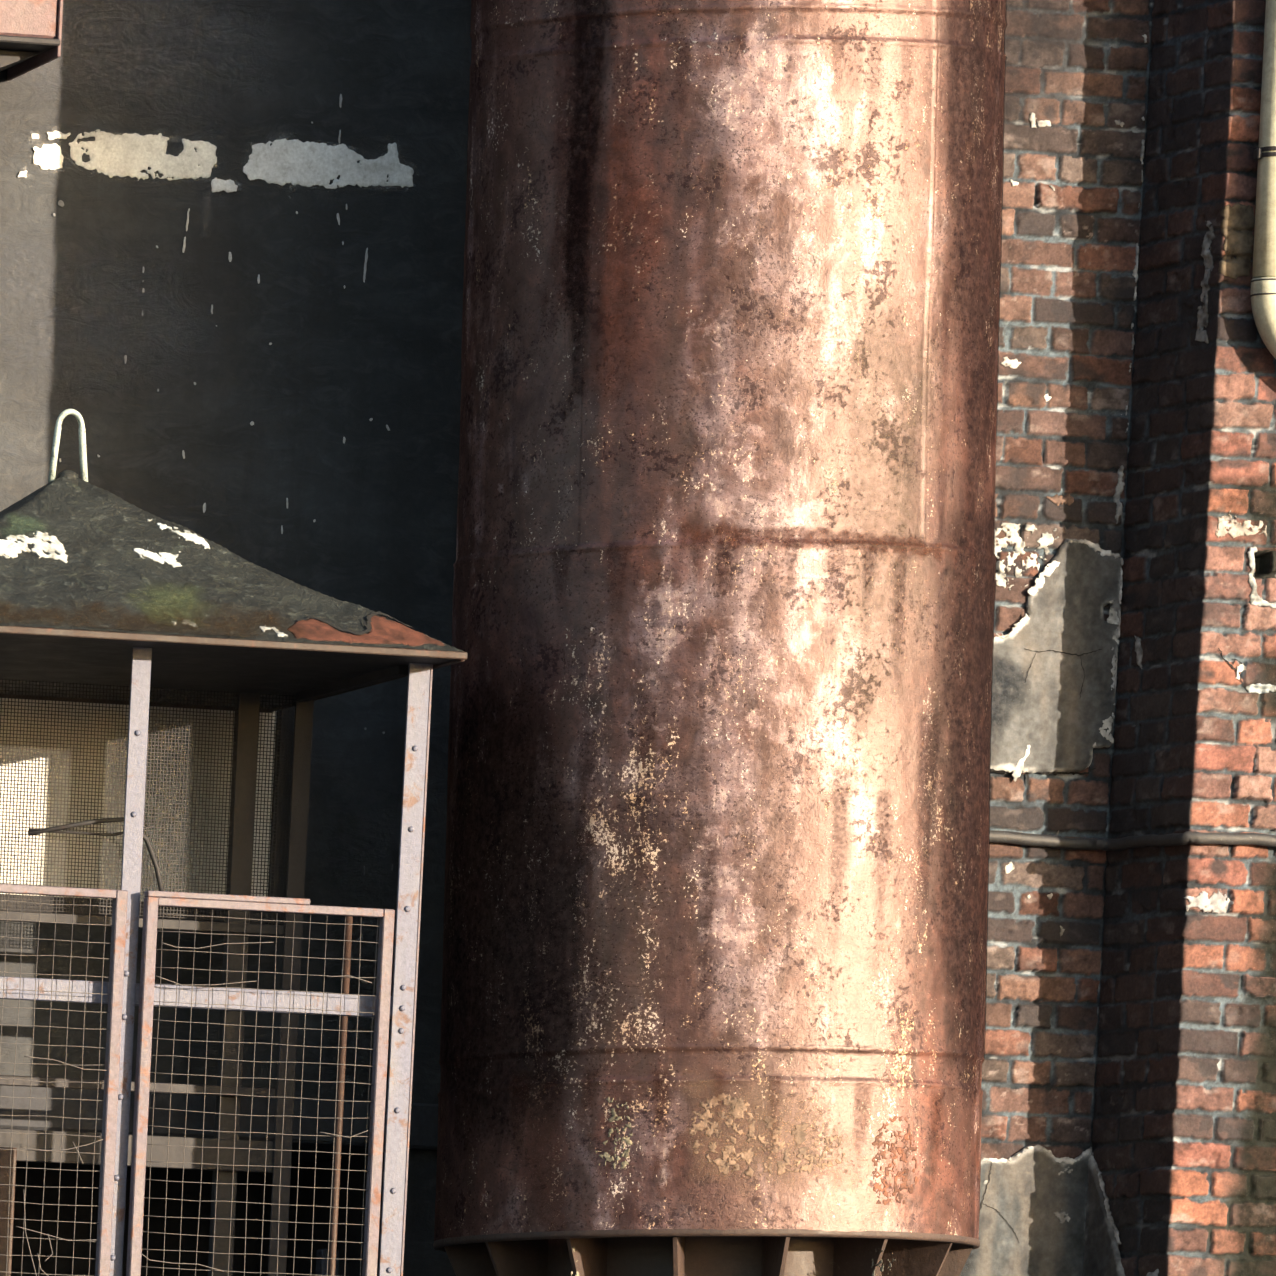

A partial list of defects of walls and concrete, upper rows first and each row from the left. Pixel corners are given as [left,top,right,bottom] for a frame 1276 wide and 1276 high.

peeling [18,129,414,193]
spalling [1046,493,1074,509]
rust [682,525,941,573]
flaking render [1027,560,1060,596]
flaking render [1068,539,1124,642]
rust [288,614,445,647]
flaking render [994,613,1030,640]
crack [1024,648,1102,697]
flaking render [981,1144,1092,1164]